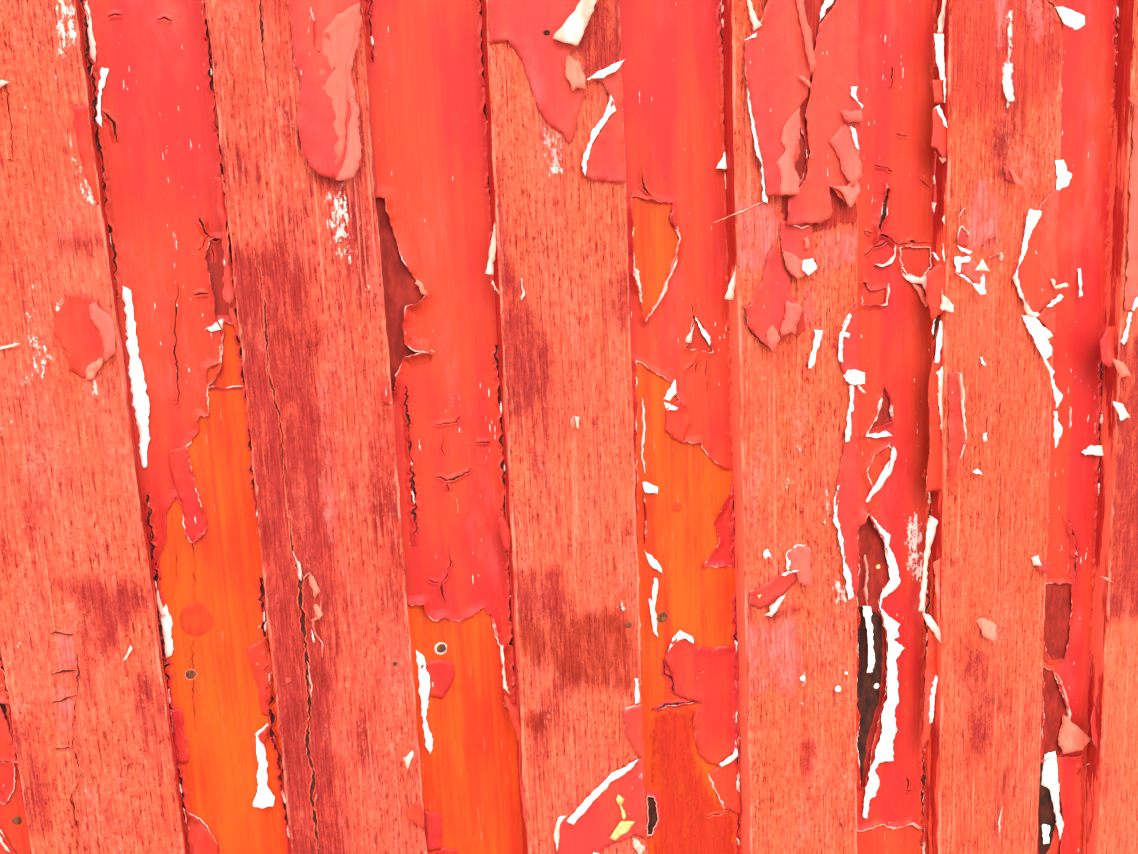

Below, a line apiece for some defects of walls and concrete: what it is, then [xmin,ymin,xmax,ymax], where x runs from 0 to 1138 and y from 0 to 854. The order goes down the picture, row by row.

crack [49,608,87,854]
peeling [0,286,150,468]
peeling [152,175,286,854]
peeling [288,0,362,264]
peeling [403,594,523,854]
peeling [488,0,685,329]
peeling [554,354,813,854]
peeling [725,0,863,368]
peeling [824,276,959,854]
peeling [864,0,1003,493]
peeling [1002,10,1015,115]
peeling [1012,160,1083,448]